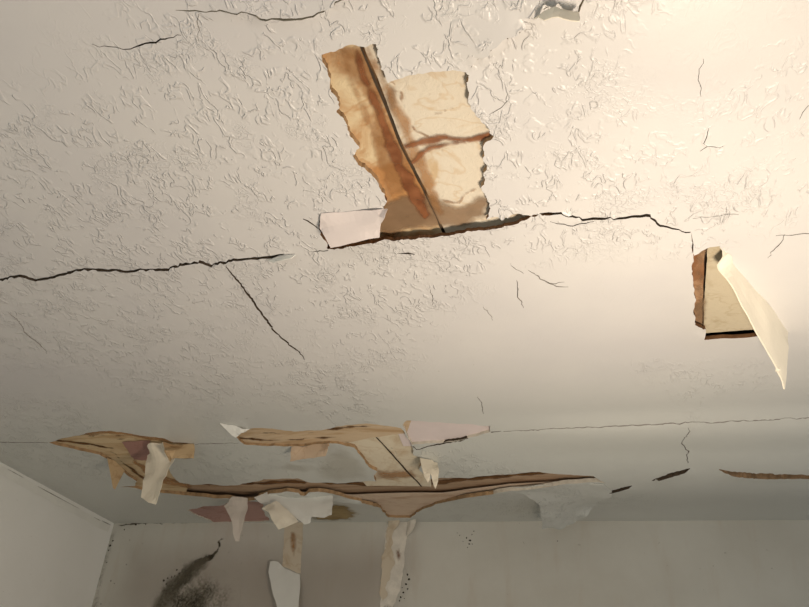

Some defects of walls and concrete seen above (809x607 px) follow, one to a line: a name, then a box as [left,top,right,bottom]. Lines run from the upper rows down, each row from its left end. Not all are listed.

peeling [529,0,584,22]
spalling [319,44,553,249]
crack [551,212,739,233]
crack [0,254,304,358]
crack [510,263,562,306]
spalling [691,233,789,389]
spalling [49,431,195,505]
leakage [155,541,220,607]
peeling [187,492,333,607]
spalling [220,420,612,607]
crack [609,486,631,494]
crack [503,417,809,481]